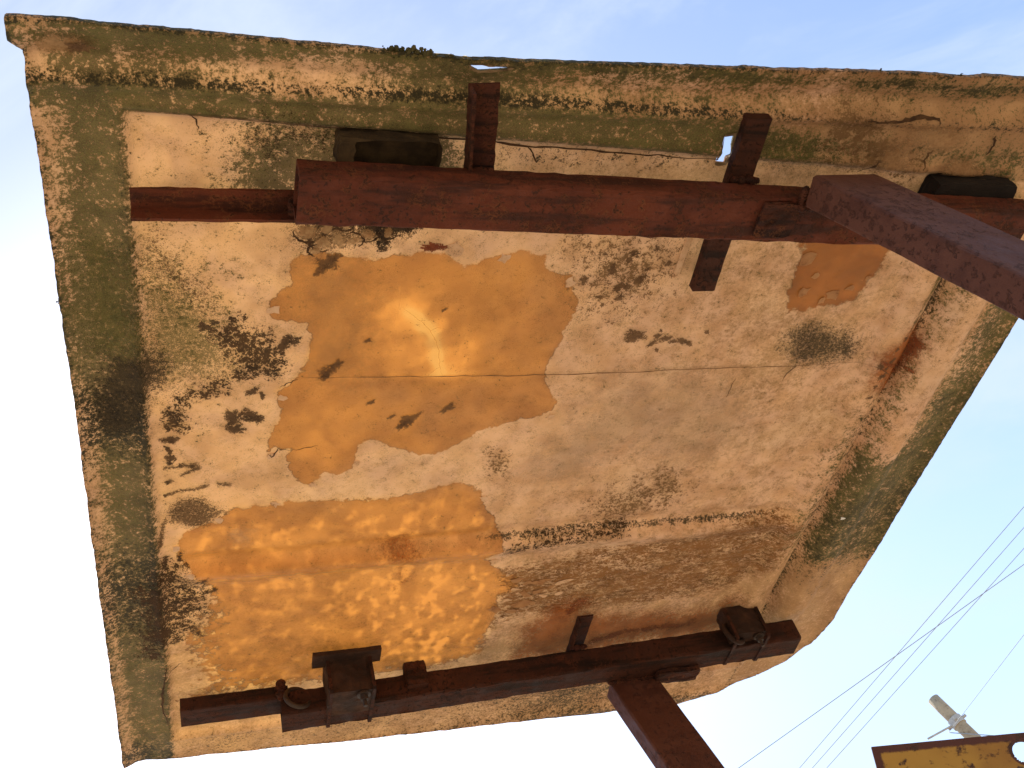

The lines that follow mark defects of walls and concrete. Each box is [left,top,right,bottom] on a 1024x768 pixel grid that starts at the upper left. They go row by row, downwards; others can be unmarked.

crack [138,111,361,130]
crack [496,141,719,163]
crack [868,114,941,126]
peeling [785,243,890,314]
peeling [266,252,351,502]
crack [396,362,889,397]
damp [773,318,868,370]
corrosion [866,328,926,399]
damp [84,226,302,664]
damp [501,462,700,556]
peeling [185,584,268,695]